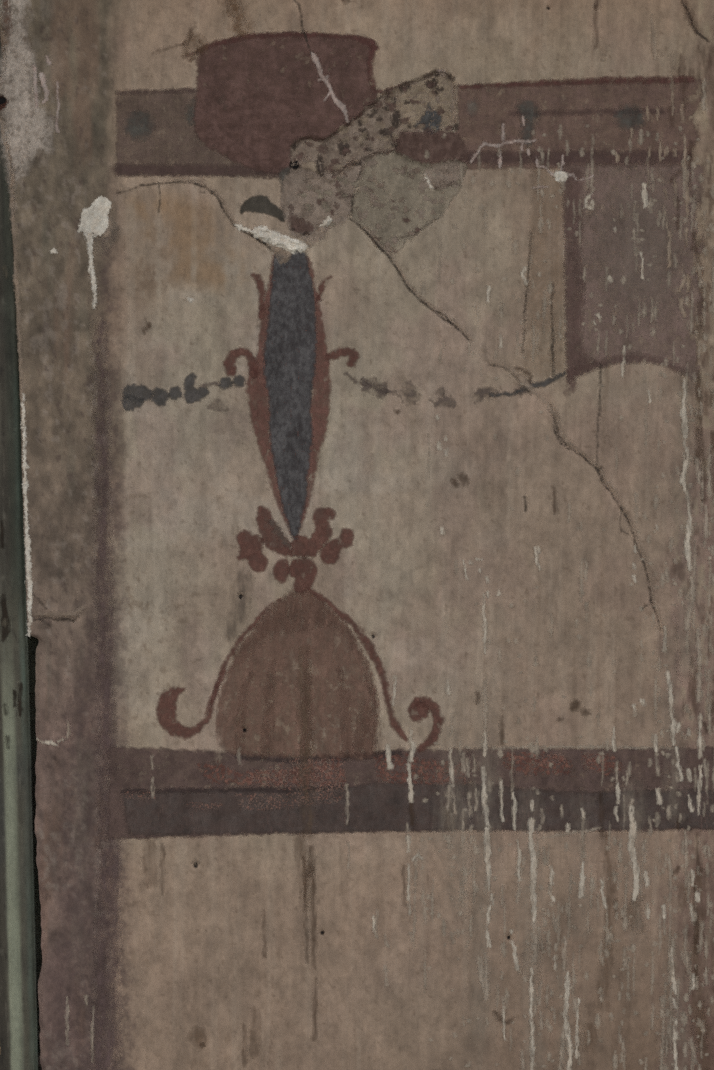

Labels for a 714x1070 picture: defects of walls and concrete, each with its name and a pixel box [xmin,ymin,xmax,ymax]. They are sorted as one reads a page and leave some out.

crack [301,16,349,122]
efflorescence [77,196,112,308]
crack [141,179,266,244]
flaking render [234,69,468,264]
crack [470,116,593,188]
crack [350,218,663,622]
leakage [406,729,423,914]
leakage [447,680,563,1070]
leakage [566,809,593,898]
leakage [553,936,592,1070]